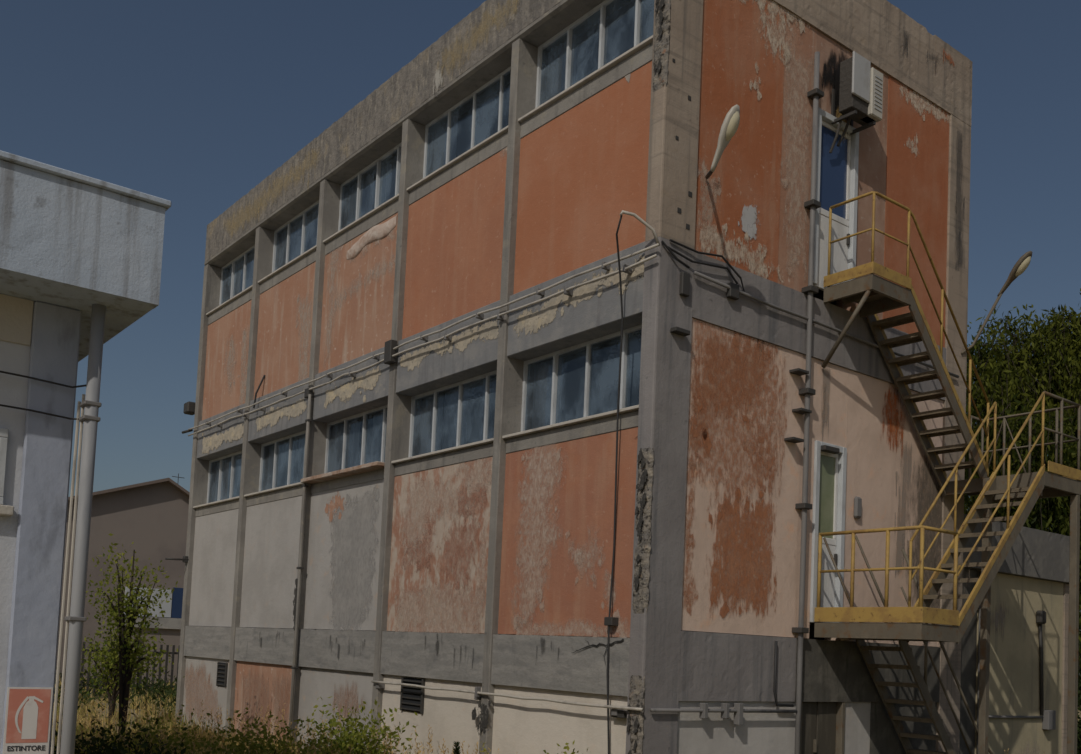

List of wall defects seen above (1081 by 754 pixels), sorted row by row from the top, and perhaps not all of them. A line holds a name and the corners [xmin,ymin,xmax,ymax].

spalling [577,0,671,92]
peeling [739,0,810,70]
peeling [900,86,950,123]
peeling [697,161,783,282]
rust [883,389,903,451]
peeling [684,322,787,618]
peeling [514,445,654,638]